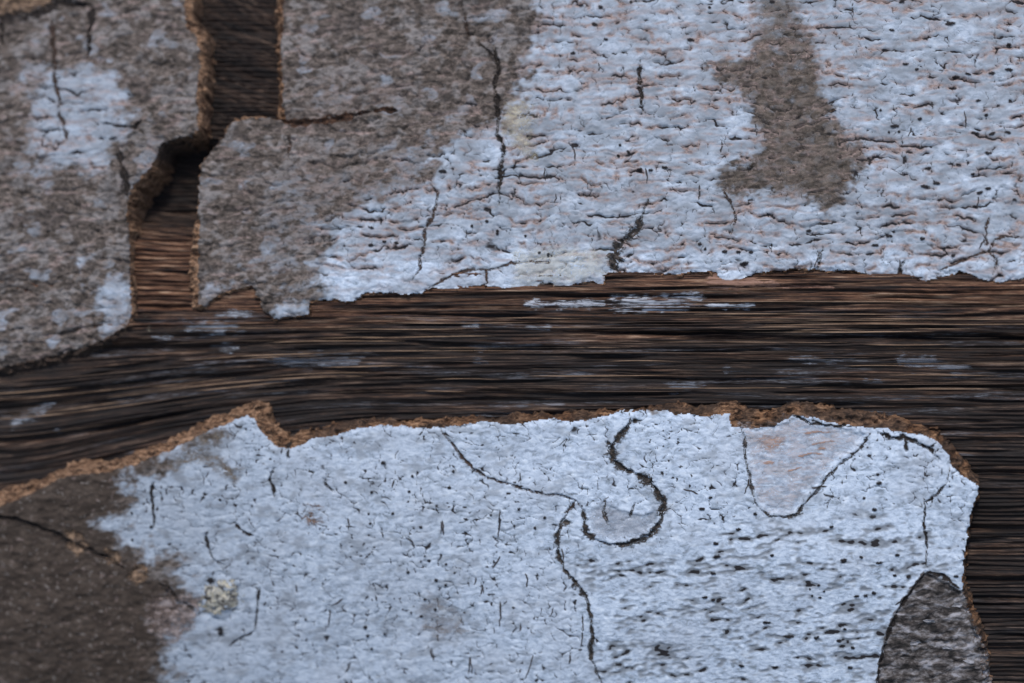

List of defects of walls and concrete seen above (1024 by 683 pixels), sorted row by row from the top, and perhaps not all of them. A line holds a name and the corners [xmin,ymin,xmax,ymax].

crack [0,0,96,141]
crack [464,17,506,204]
crack [606,199,649,272]
crack [441,413,668,683]
crack [740,415,959,681]
peeling [876,572,993,683]